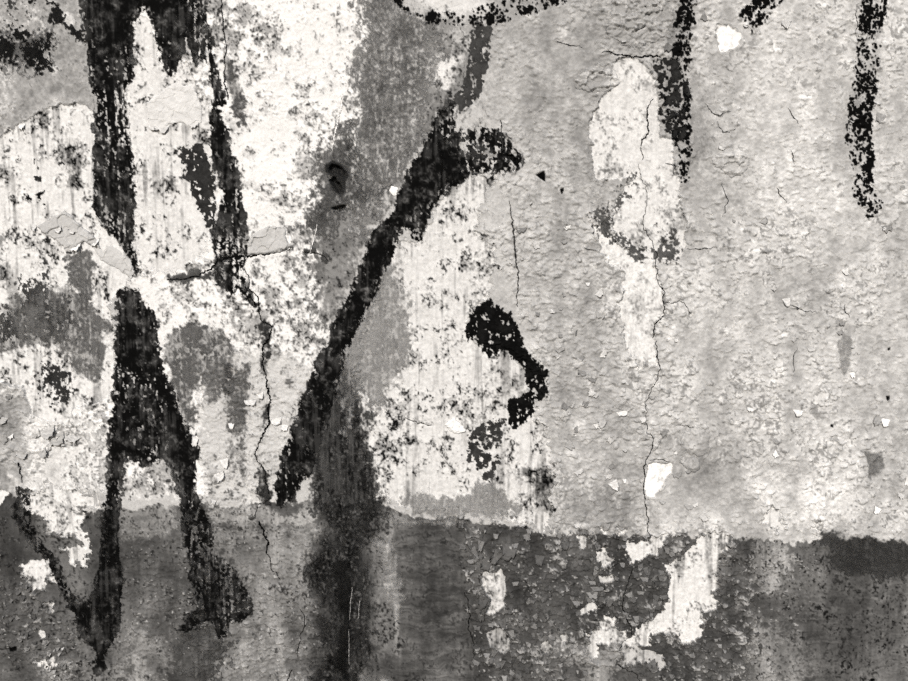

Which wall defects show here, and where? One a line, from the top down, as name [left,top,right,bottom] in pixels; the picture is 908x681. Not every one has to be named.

crack [220,0,229,100]
peeling [0,8,218,460]
peeling [588,56,688,371]
peeling [22,481,101,567]
peeling [213,458,229,483]
crack [167,247,328,579]
peeling [270,417,289,431]
damp [298,361,403,681]
peeling [351,163,763,681]
peeling [873,415,890,427]
peeling [0,559,71,681]